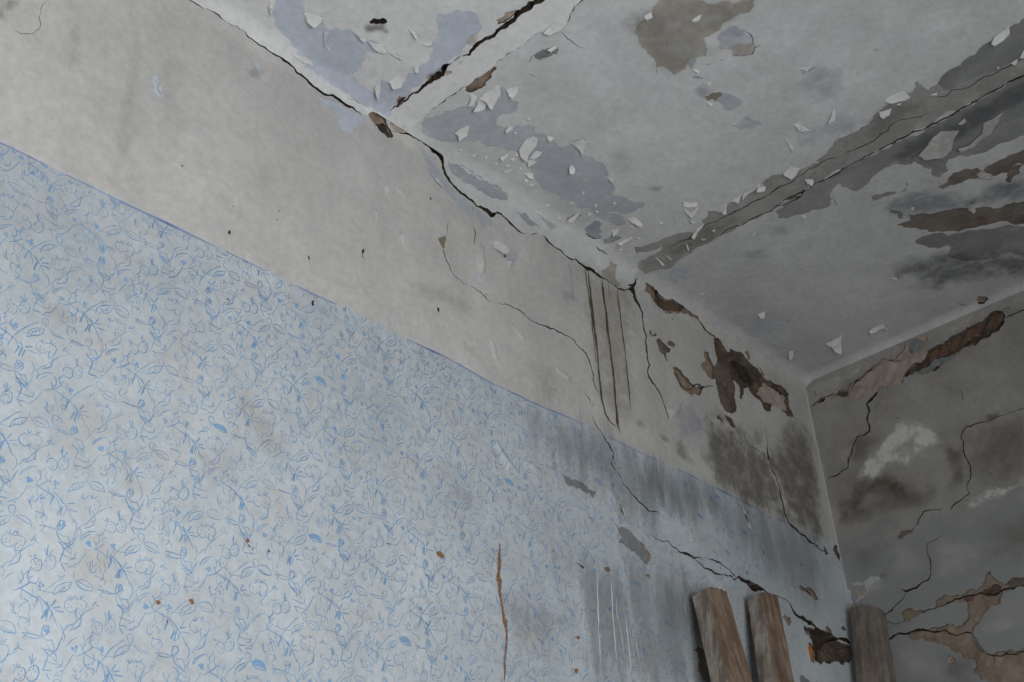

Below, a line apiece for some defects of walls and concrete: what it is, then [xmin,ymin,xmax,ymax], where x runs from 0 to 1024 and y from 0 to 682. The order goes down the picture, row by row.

crack [190,0,669,419]
peeling [267,0,1024,428]
crack [665,59,1024,250]
crack [443,221,851,644]
damp [711,432,820,533]
crack [828,388,879,479]
damp [856,421,939,503]
crack [885,408,1023,615]
corrosion [496,544,508,681]
spalling [783,614,852,665]
spalling [887,571,1024,682]